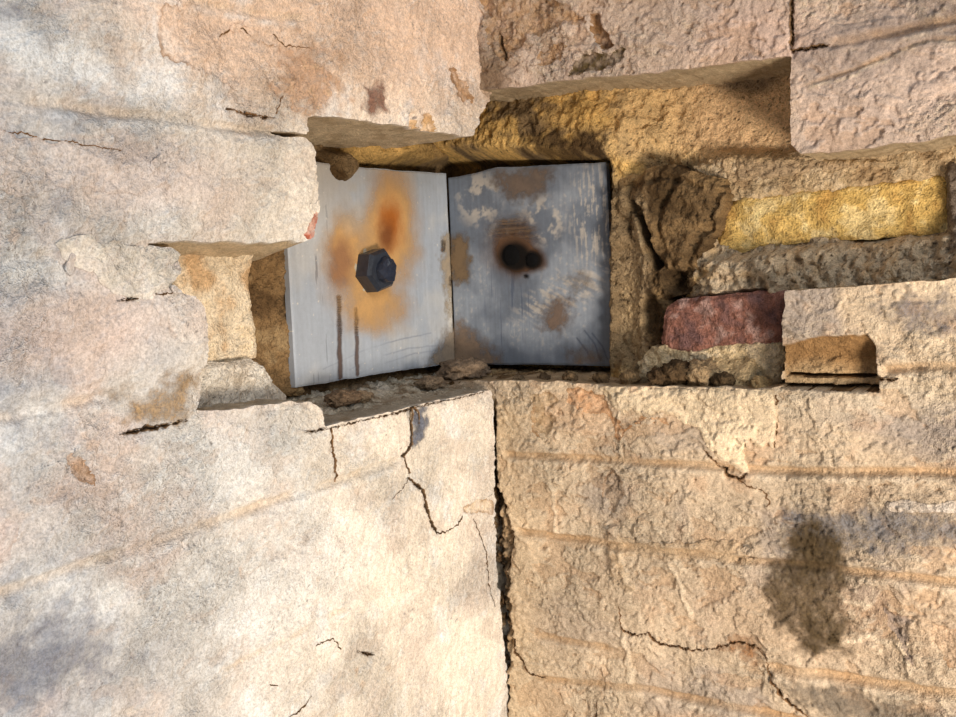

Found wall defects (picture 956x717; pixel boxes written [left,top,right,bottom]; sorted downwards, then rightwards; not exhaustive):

rust [327,173,414,379]
spalling [54,66,956,473]
peeling [58,448,96,486]
crack [706,451,770,507]
crack [305,391,545,715]
damp [763,512,956,655]
crack [618,606,809,717]